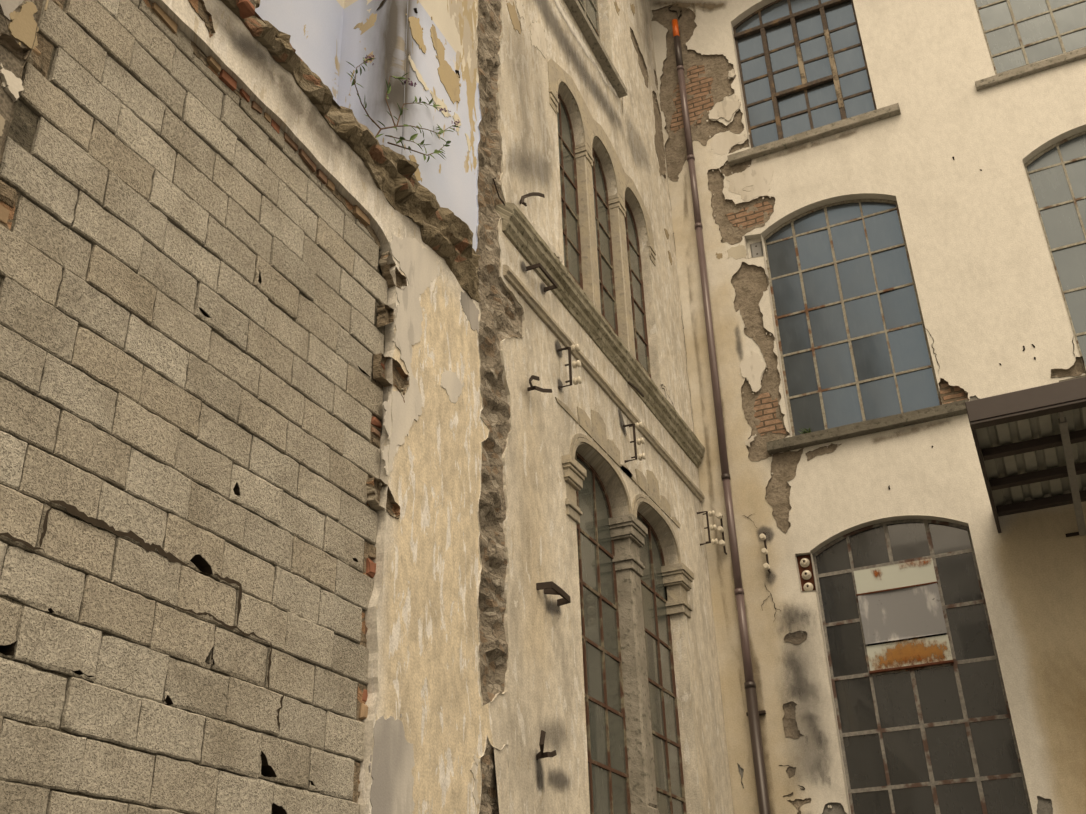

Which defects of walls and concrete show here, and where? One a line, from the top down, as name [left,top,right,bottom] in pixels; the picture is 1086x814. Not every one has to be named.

peeling [0,0,54,78]
flaking render [188,0,215,37]
peeling [0,63,24,102]
peeling [406,14,471,151]
peeling [191,40,439,519]
flaking render [614,0,841,533]
crack [0,498,189,565]
flaking render [363,541,376,579]
crack [163,574,284,731]
peeling [352,683,415,814]
flaking render [822,802,847,814]
flaking render [1037,796,1053,814]